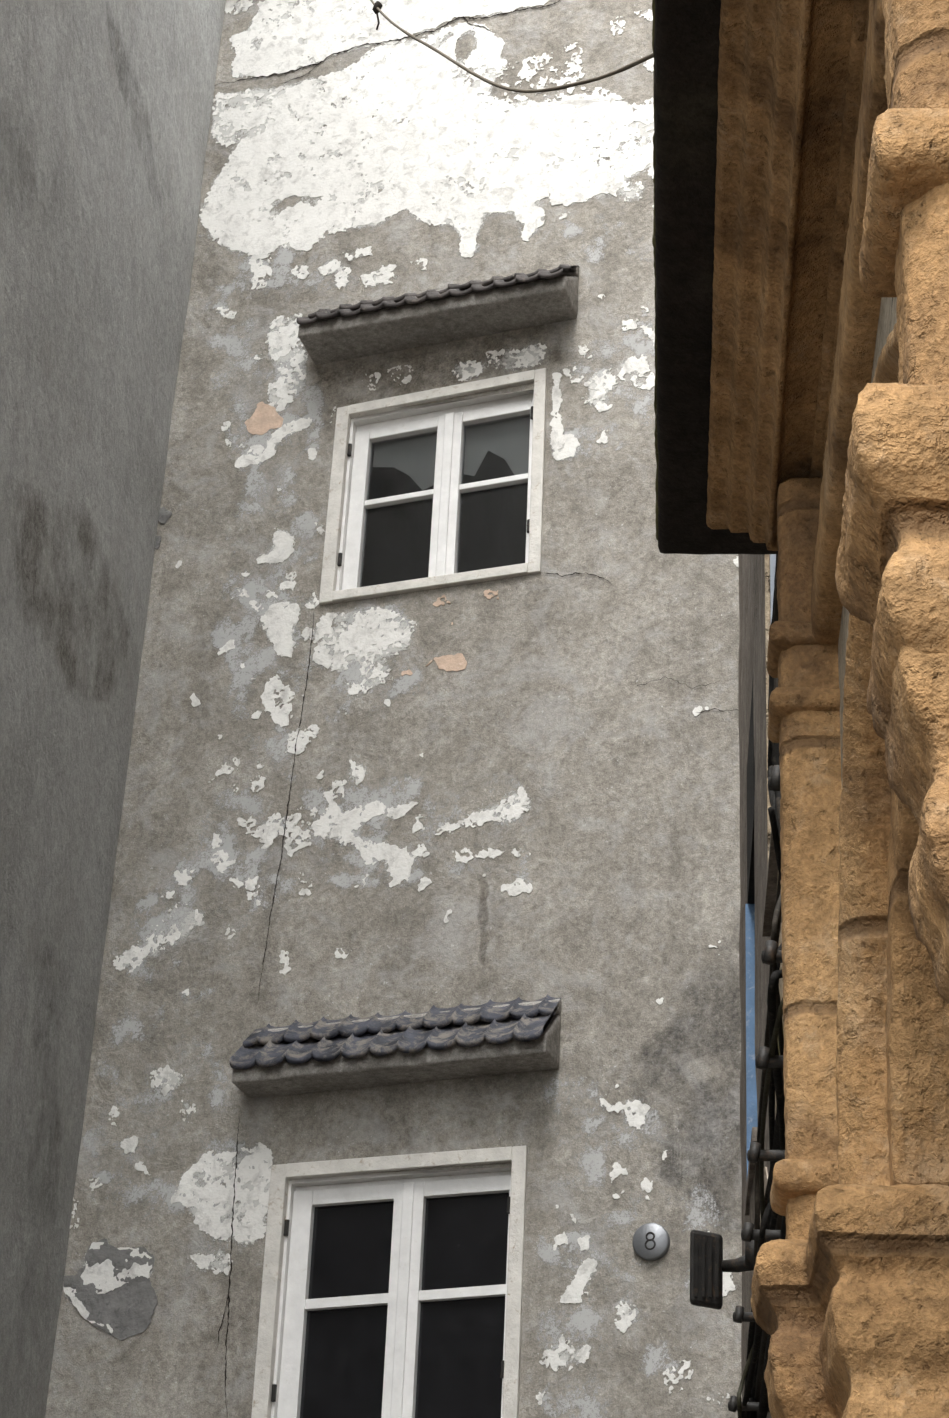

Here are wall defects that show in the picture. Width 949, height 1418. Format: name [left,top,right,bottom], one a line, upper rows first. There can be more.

crack [219,0,560,84]
peeling [199,0,654,290]
peeling [221,313,312,469]
peeling [231,528,467,707]
peeling [217,639,320,755]
crack [257,609,315,1003]
peeling [237,760,534,892]
spalling [63,1238,158,1340]
peeling [171,1142,274,1275]
crack [216,1119,240,1417]
peeling [553,1205,598,1304]
peeling [723,1272,735,1296]